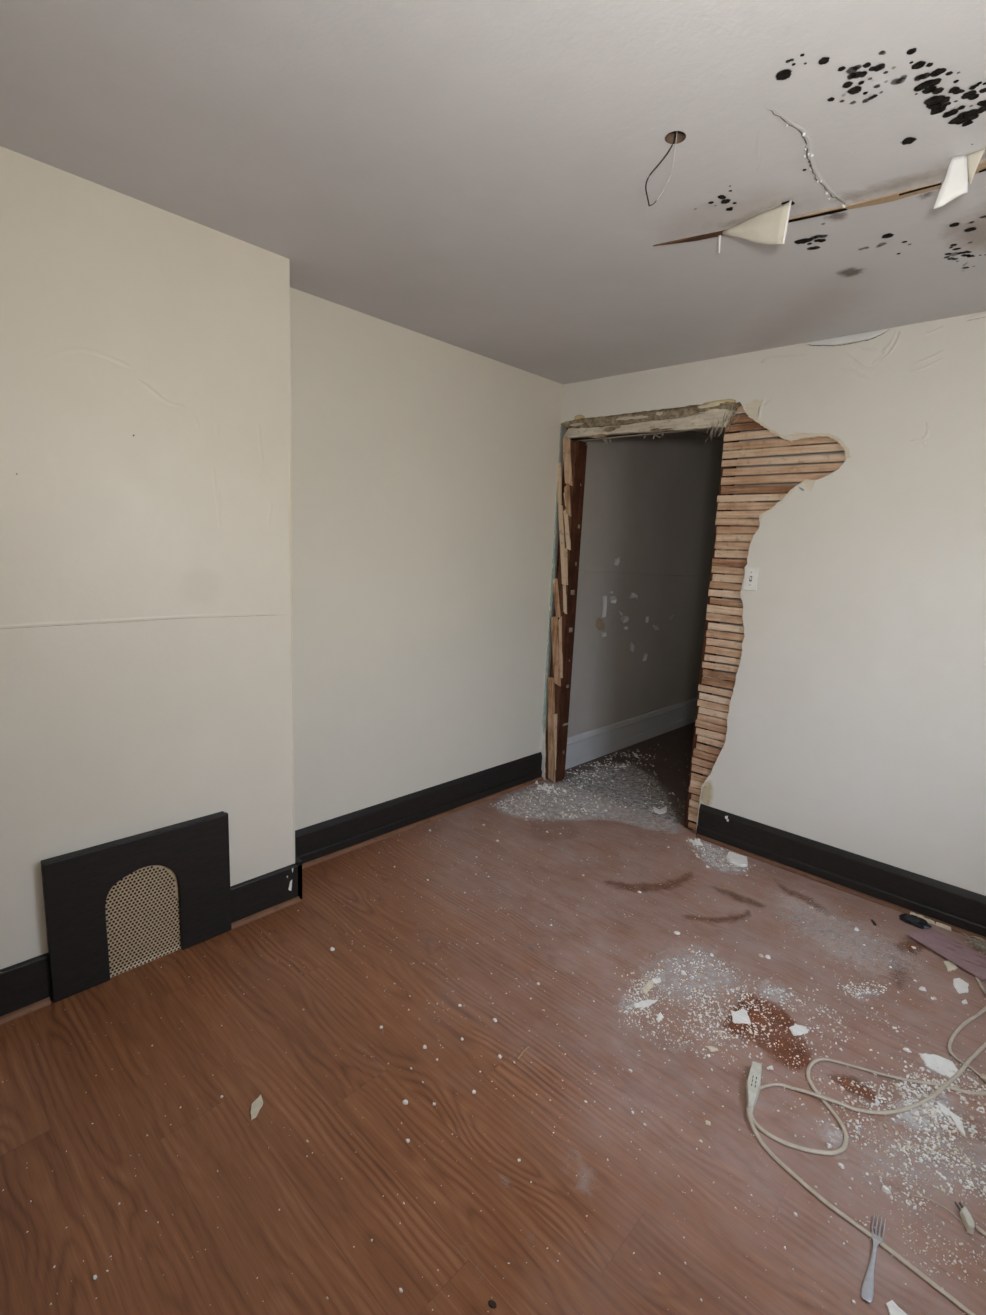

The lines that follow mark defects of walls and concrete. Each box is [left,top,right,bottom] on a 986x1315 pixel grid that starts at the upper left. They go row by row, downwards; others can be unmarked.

damp [776,48,986,127]
crack [767,106,849,208]
damp [708,185,737,211]
damp [794,235,827,250]
damp [944,215,986,269]
peeling [558,412,663,463]
peeling [596,591,648,661]
spalling [684,399,851,830]